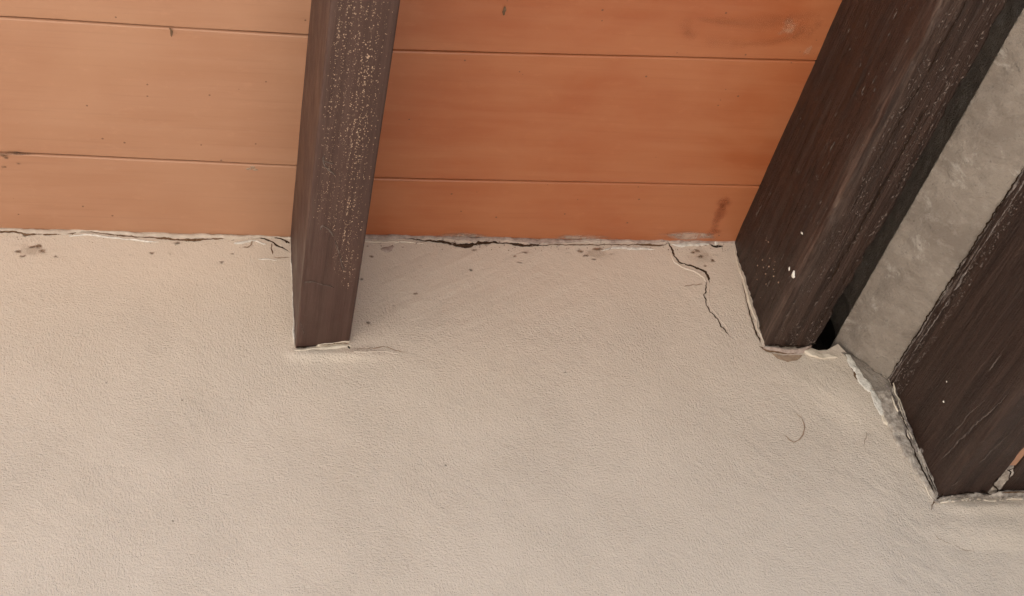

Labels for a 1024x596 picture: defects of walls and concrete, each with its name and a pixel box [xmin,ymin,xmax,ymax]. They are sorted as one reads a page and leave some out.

crack [410,238,733,339]
peeling [365,0,1024,505]